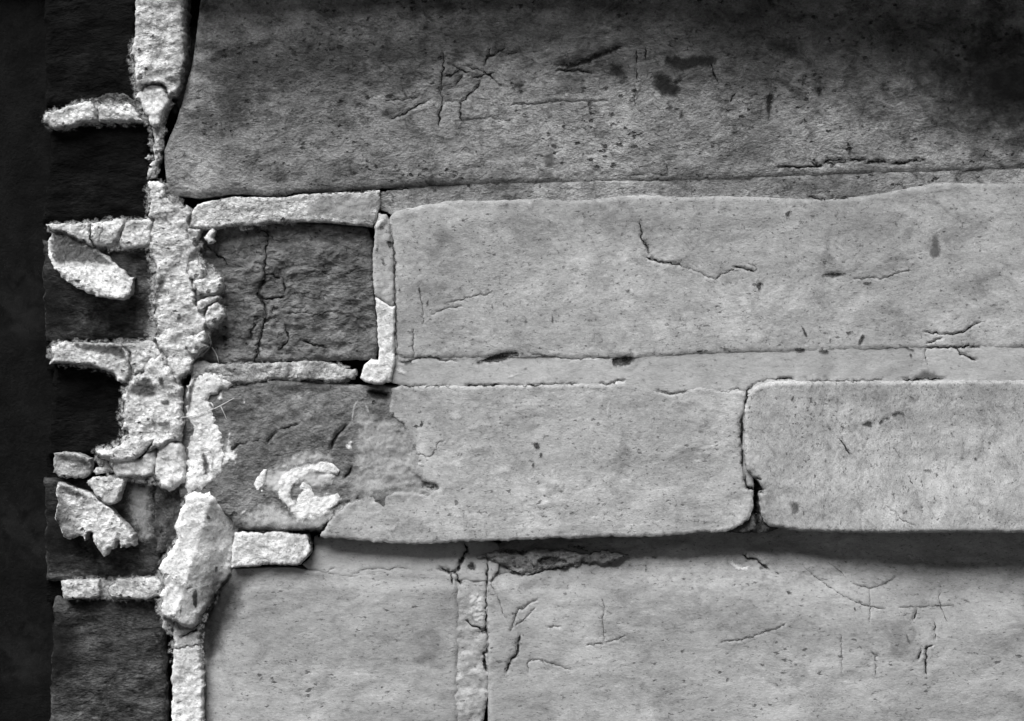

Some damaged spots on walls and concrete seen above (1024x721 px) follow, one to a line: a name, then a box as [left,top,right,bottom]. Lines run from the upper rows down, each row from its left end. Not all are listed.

crack [386,49,602,125]
peeling [48,232,136,301]
crack [249,230,352,361]
crack [639,223,755,278]
crack [903,322,980,381]
spalling [367,390,389,399]
peeling [344,408,438,506]
peeling [243,512,340,529]
crack [744,477,763,526]
spalling [500,550,567,564]